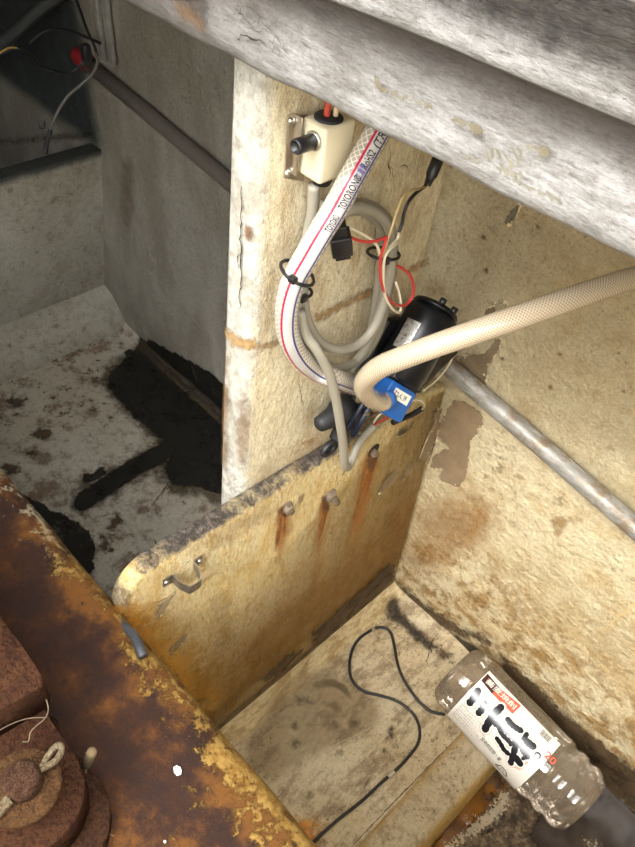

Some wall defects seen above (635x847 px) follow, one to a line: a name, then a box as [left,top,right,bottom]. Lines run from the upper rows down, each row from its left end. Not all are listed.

crack [223,6,287,56]
crack [235,186,243,308]
peeling [457,337,503,385]
peeling [419,400,484,487]
rust [356,455,377,524]
rust [276,508,287,544]
rust [118,607,220,707]
leakage [387,598,453,663]
leakage [396,581,492,652]
leakage [500,653,635,815]